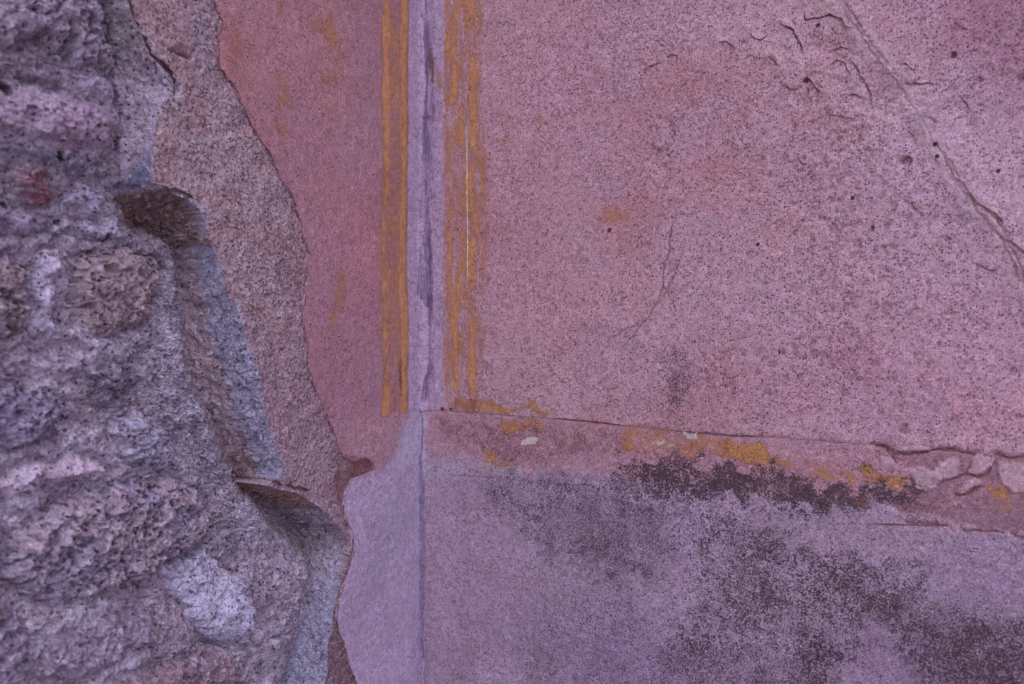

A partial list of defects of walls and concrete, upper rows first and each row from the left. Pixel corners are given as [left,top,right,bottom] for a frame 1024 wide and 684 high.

crack [842,0,918,110]
crack [936,139,1024,283]
spalling [0,0,373,684]
crack [419,407,975,684]
damp [456,425,1024,684]
peeling [875,444,1024,538]